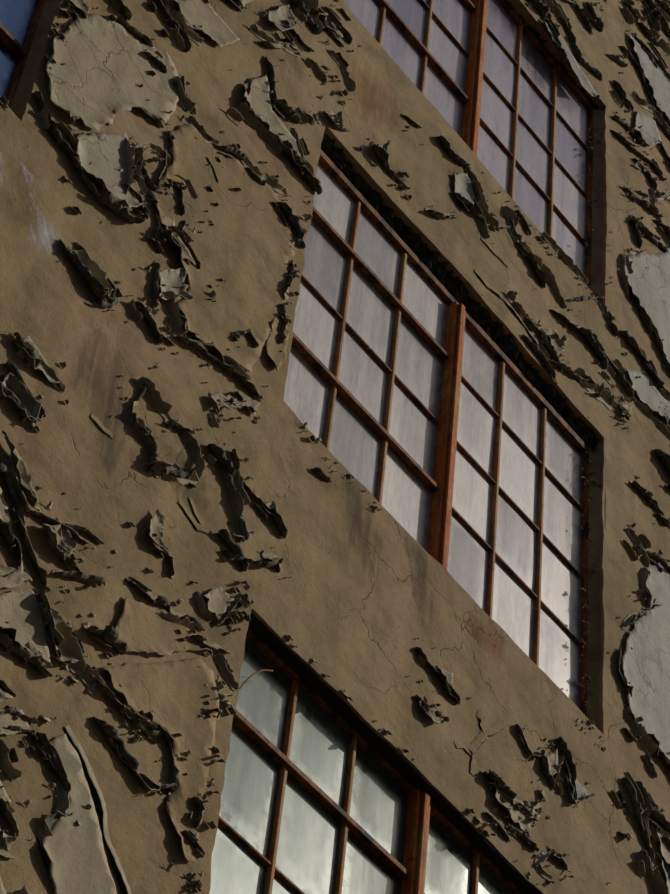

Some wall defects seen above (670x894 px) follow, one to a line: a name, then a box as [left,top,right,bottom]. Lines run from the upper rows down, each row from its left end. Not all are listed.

peeling [0,332,69,432]
peeling [32,0,670,656]
peeling [0,375,292,894]
crack [454,708,504,776]
peeling [468,724,595,884]
peeling [608,523,670,778]